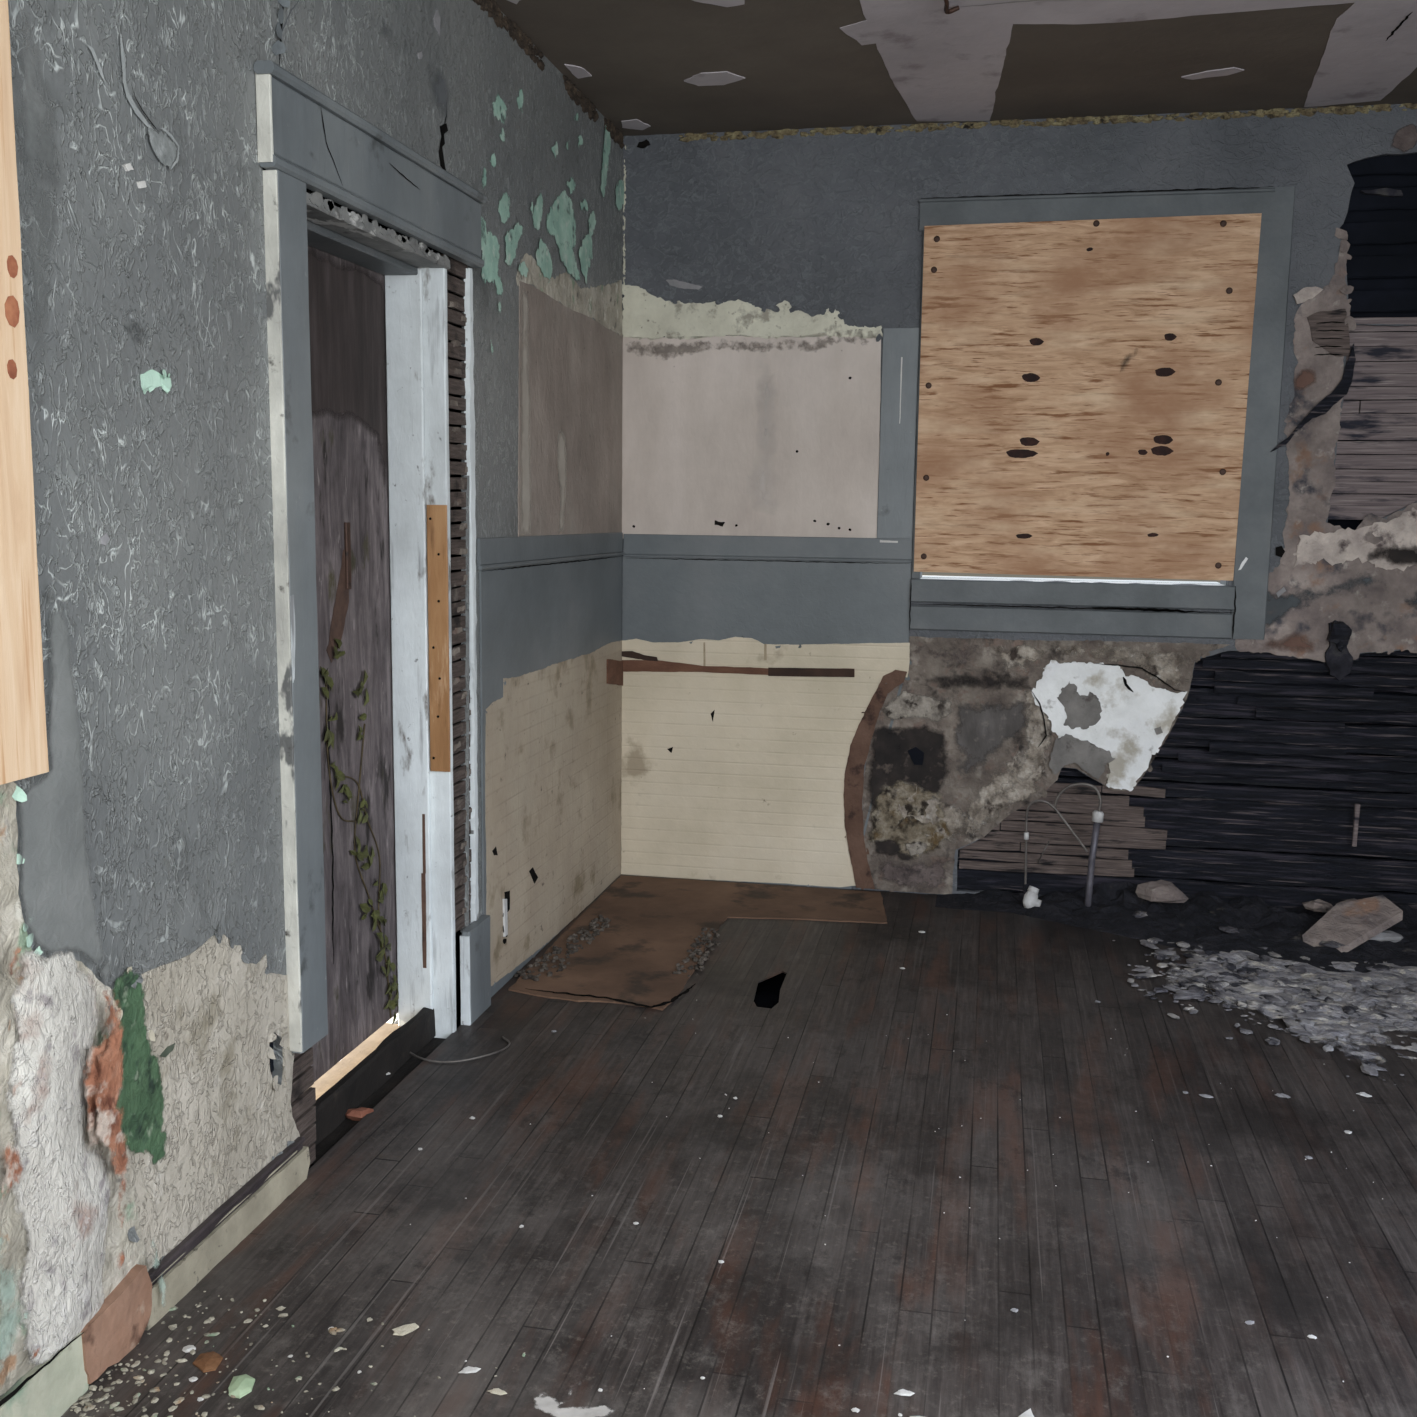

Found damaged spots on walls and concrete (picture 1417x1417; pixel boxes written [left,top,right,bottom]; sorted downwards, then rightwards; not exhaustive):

crack [439,104,448,170]
spalling [473,0,545,71]
peeling [481,75,1417,987]
peeling [0,782,300,1395]